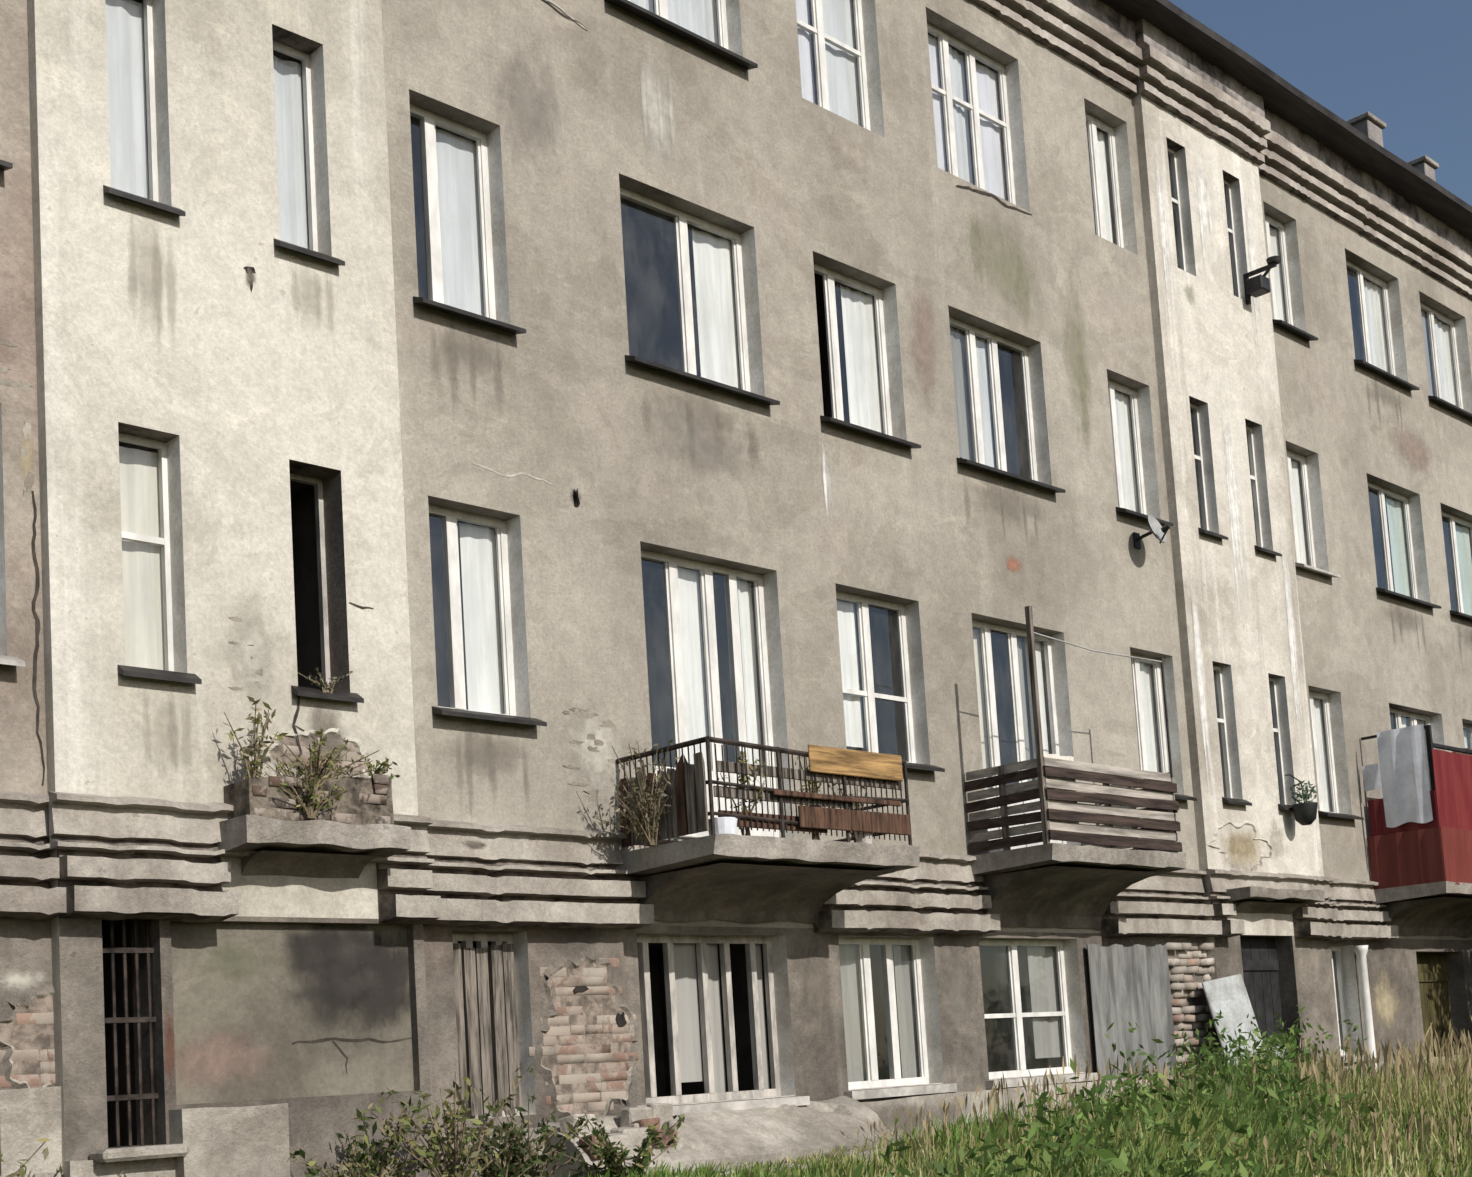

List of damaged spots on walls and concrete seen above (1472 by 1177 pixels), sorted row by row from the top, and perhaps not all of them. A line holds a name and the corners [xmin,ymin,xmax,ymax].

crack [543,0,588,30]
crack [31,491,45,785]
flaking render [1205,818,1283,872]
leakage [293,931,407,1026]
flaking render [0,972,55,1089]
crack [292,1037,412,1072]
flaking render [529,950,639,1119]